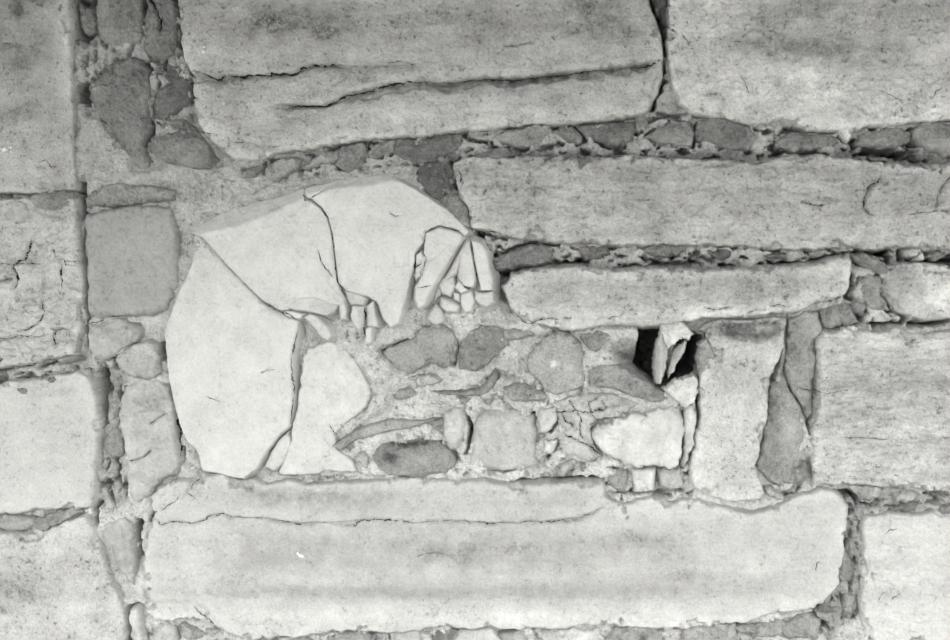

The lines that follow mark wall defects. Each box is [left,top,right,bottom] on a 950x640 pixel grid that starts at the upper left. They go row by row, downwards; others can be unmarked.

crack [191,64,344,81]
crack [290,27,776,109]
crack [2,240,85,288]
crack [303,191,367,336]
crack [414,226,536,293]
crack [0,301,115,371]
crack [260,298,330,451]
peeling [651,321,715,468]